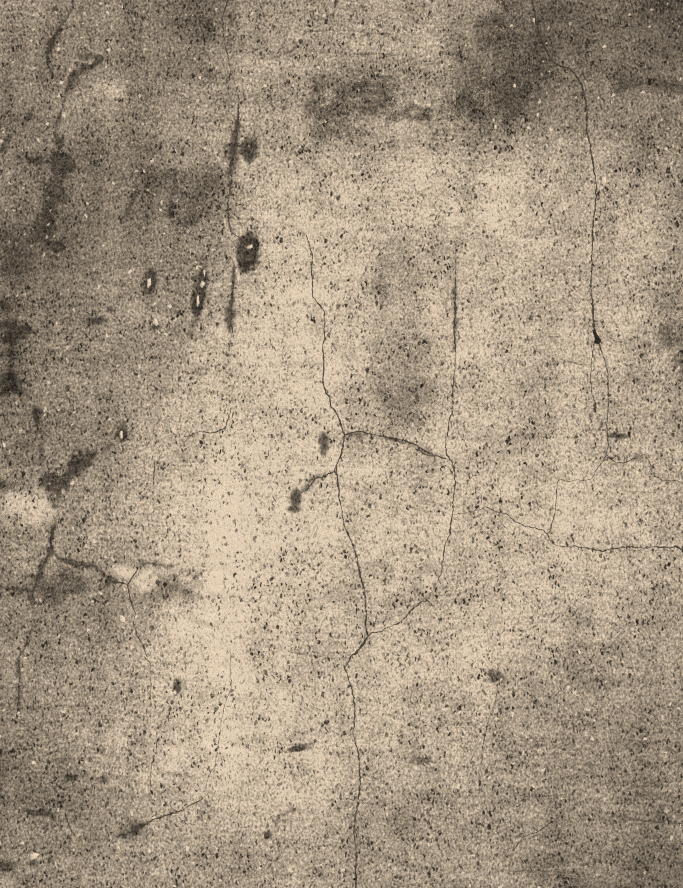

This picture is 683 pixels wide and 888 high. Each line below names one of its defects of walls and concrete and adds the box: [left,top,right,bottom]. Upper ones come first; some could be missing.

crack [45,0,74,71]
water stain [473,64,530,117]
crack [44,91,67,220]
crack [303,0,683,887]
crack [0,487,172,703]
crack [16,629,32,725]